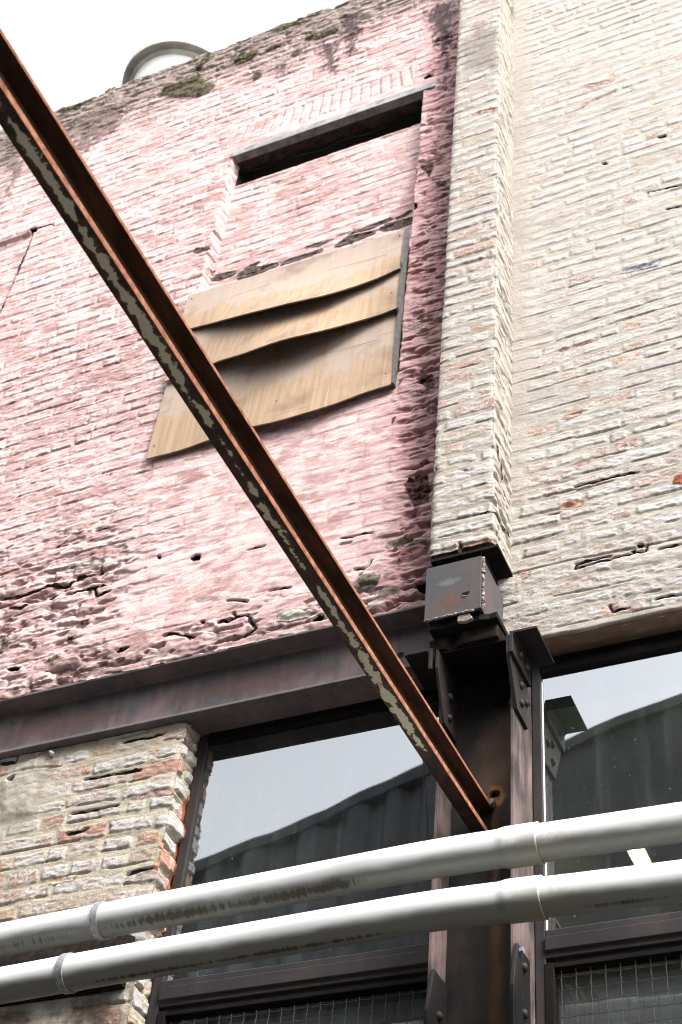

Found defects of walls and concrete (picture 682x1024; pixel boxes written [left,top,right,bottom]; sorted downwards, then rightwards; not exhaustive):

leakage [318,12,365,72]
leakage [423,1,460,97]
crack [2,572,111,610]
crack [165,632,195,640]
crack [217,601,257,639]
rust [486,784,506,830]